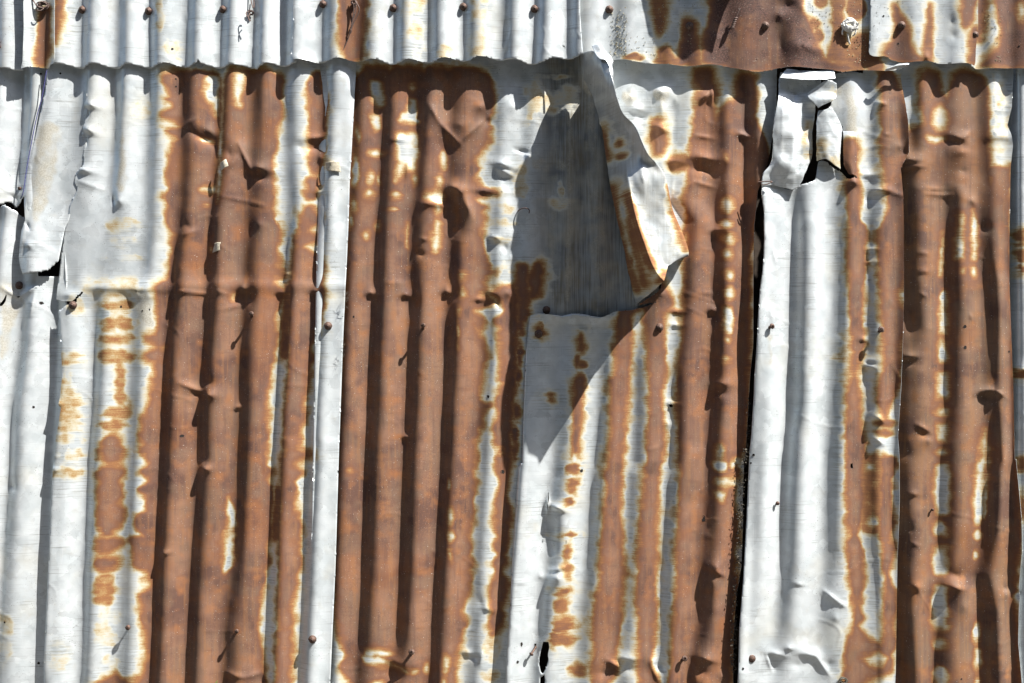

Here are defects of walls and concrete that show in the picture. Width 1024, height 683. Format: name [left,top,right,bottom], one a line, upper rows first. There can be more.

rust [44,636,76,677]
rust [52,0,774,683]
peeling [580,43,689,304]
rust [788,0,1024,683]